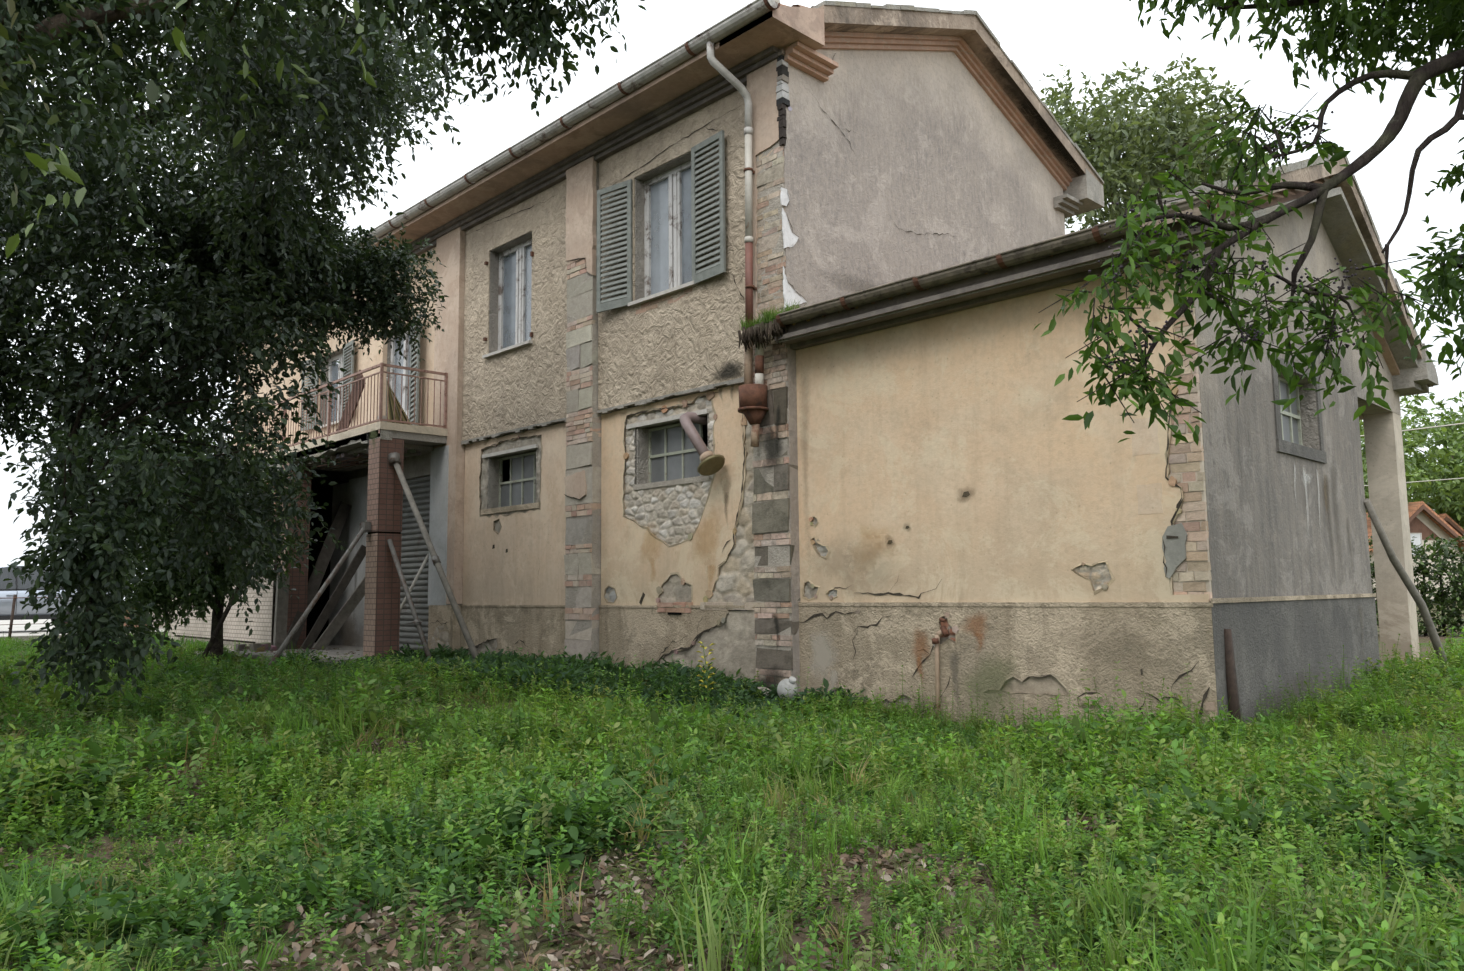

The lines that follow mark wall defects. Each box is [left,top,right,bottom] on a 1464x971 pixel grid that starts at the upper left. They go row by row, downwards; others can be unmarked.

peeling [780,187,799,248]
peeling [783,266,807,307]
peeling [1164,323,1184,525]
peeling [622,391,717,547]
crack [640,614,727,669]
peeling [625,416,756,682]
crack [800,576,942,658]
flaking render [1070,560,1116,595]